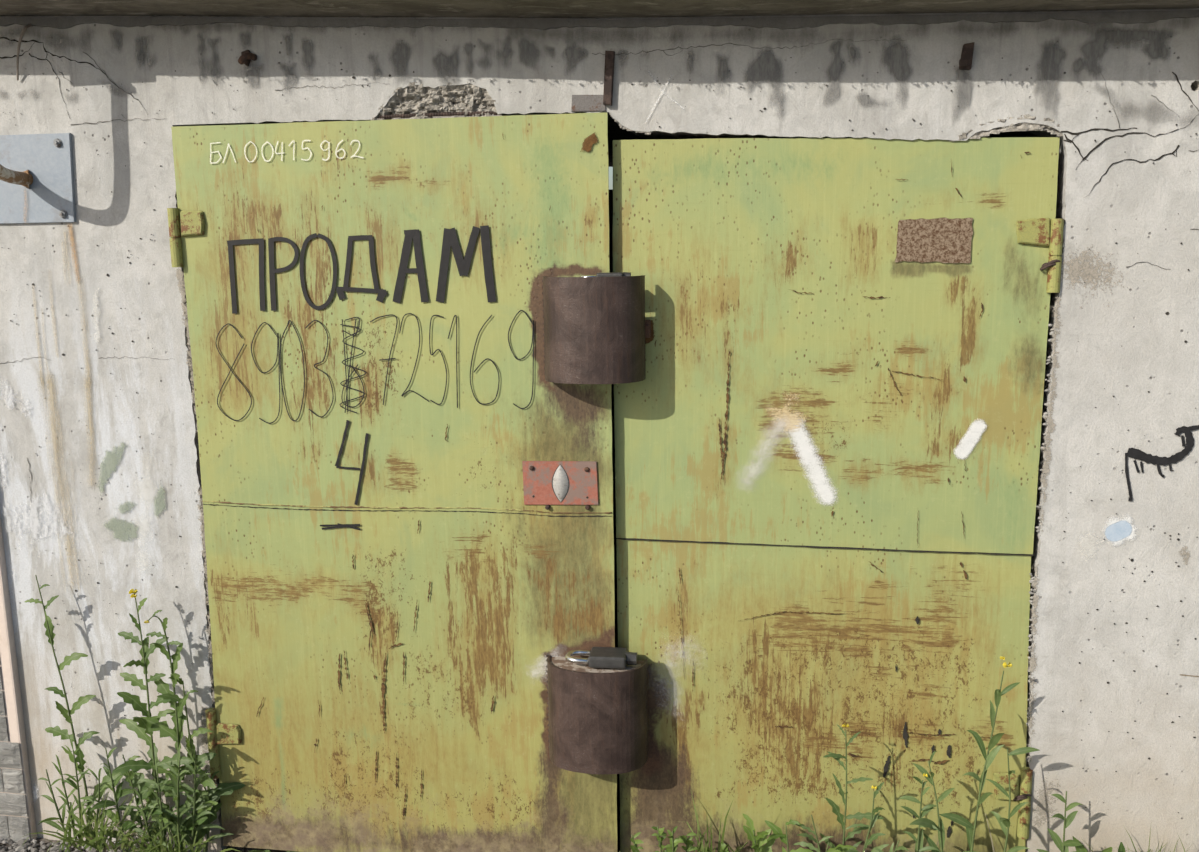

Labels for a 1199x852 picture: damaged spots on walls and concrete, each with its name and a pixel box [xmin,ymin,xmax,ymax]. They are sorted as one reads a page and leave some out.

crack [0,37,160,125]
damp [281,36,313,86]
spalling [371,70,502,120]
damp [433,28,586,81]
damp [747,36,782,111]
damp [827,41,856,98]
damp [858,94,873,105]
damp [883,39,911,98]
damp [957,69,972,108]
damp [1036,23,1172,104]
crack [1061,72,1199,196]
rust [895,217,973,263]